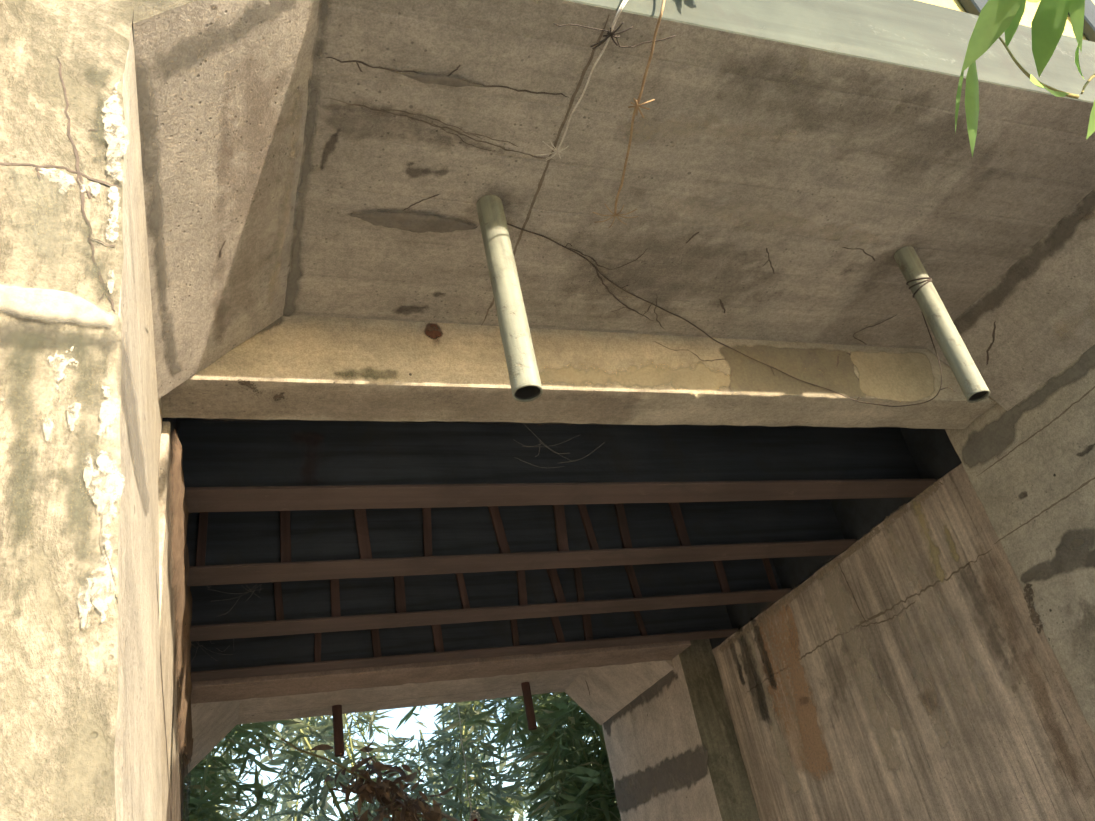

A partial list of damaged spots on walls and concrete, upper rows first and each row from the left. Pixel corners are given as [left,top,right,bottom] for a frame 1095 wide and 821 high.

crack [0,56,124,311]
leakage [94,102,110,142]
crack [326,14,609,255]
corrosion [424,323,443,339]
crack [570,248,726,362]
leakage [0,327,95,537]
leakage [64,428,102,557]